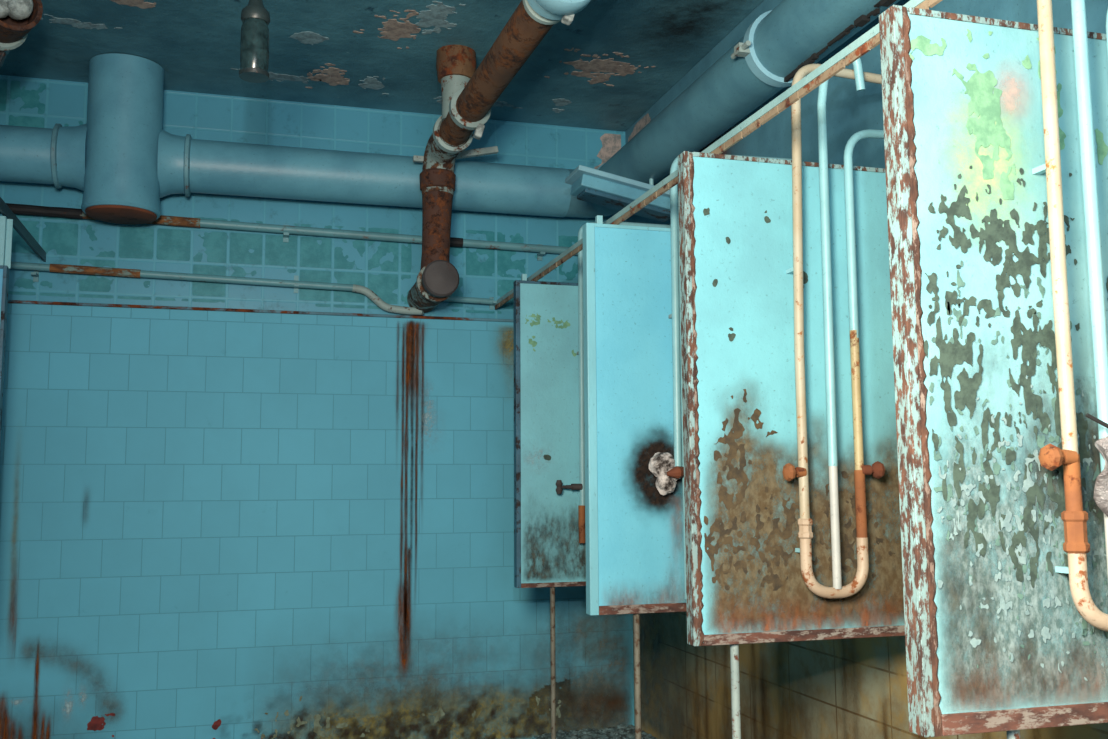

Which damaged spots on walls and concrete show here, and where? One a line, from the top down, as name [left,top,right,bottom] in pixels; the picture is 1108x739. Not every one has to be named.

peeling [290,31,329,45]
peeling [269,63,387,95]
peeling [374,1,465,49]
peeling [559,48,655,86]
peeling [910,35,947,60]
peeling [924,53,1108,668]
corrosion [397,322,424,669]
corrosion [712,409,904,633]
corrosion [0,646,50,739]
peeling [87,713,115,737]
water stain [268,614,628,739]
water stain [640,613,708,739]